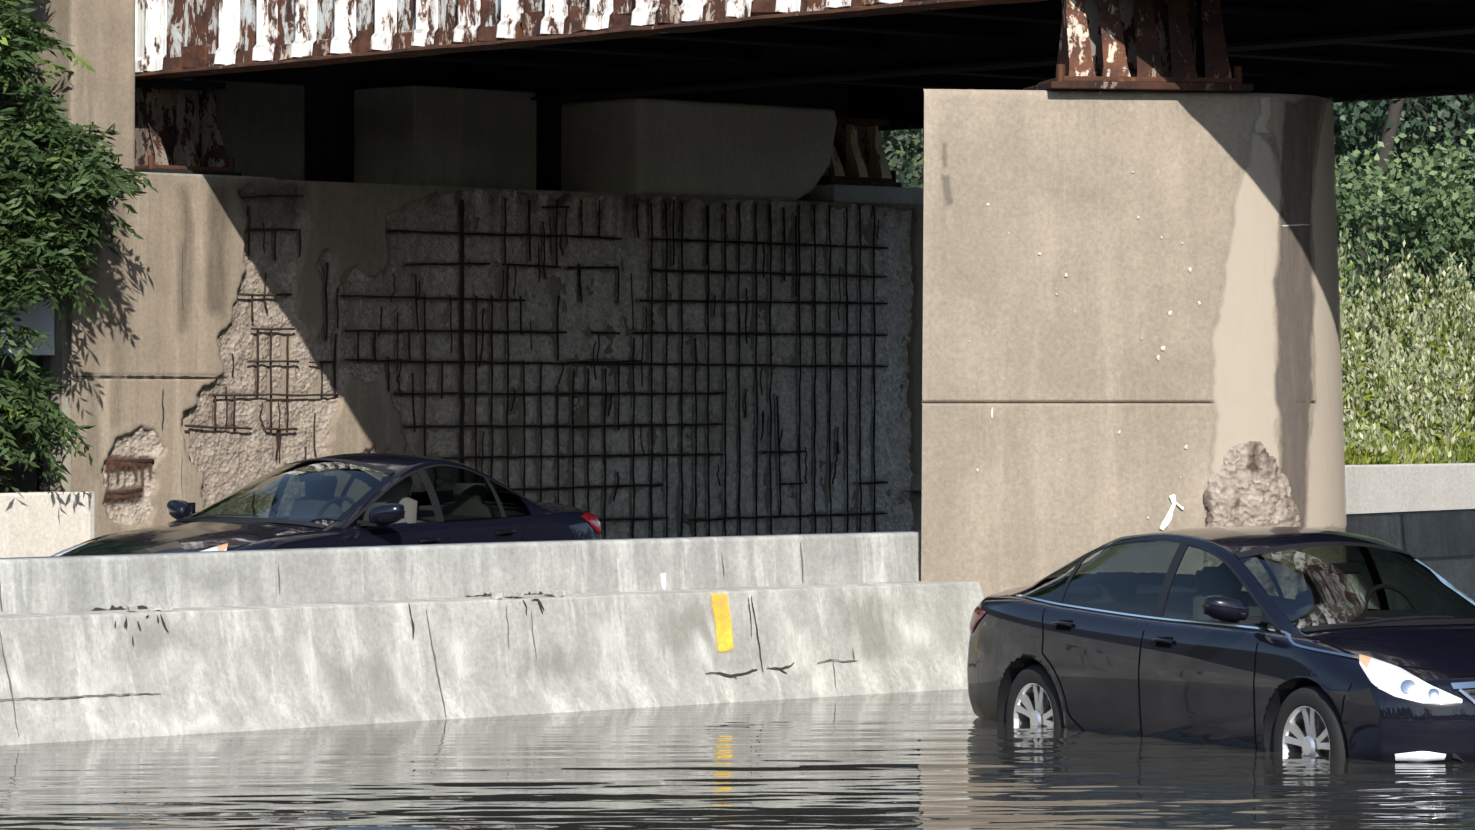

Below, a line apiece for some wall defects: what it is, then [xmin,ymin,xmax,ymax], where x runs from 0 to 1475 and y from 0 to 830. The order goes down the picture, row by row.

spalling [101,426,164,527]
spalling [184,185,914,539]
leakage [1210,97,1347,529]